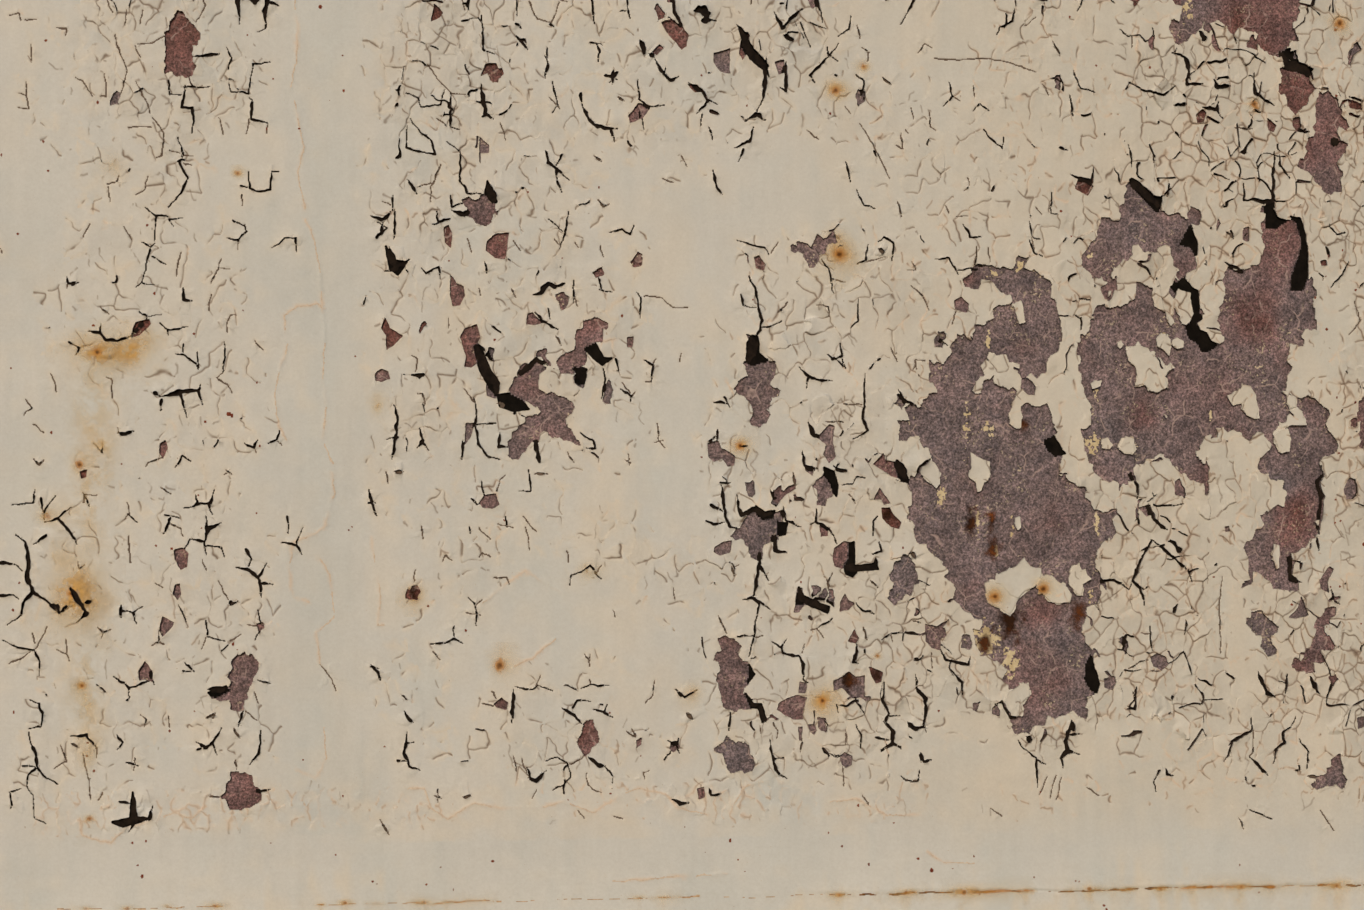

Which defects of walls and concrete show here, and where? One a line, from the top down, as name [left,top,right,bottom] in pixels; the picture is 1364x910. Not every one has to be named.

peeling [78,0,247,205]
peeling [375,0,634,466]
crack [0,0,303,832]
crack [368,0,1364,819]
peeling [602,0,1364,804]
corrosion [59,573,93,611]
peeling [206,602,264,726]
peeling [514,692,613,779]
corrosion [842,672,857,688]
corrosion [978,590,1025,652]
corrosion [791,876,1035,896]
corrosion [1049,880,1361,910]